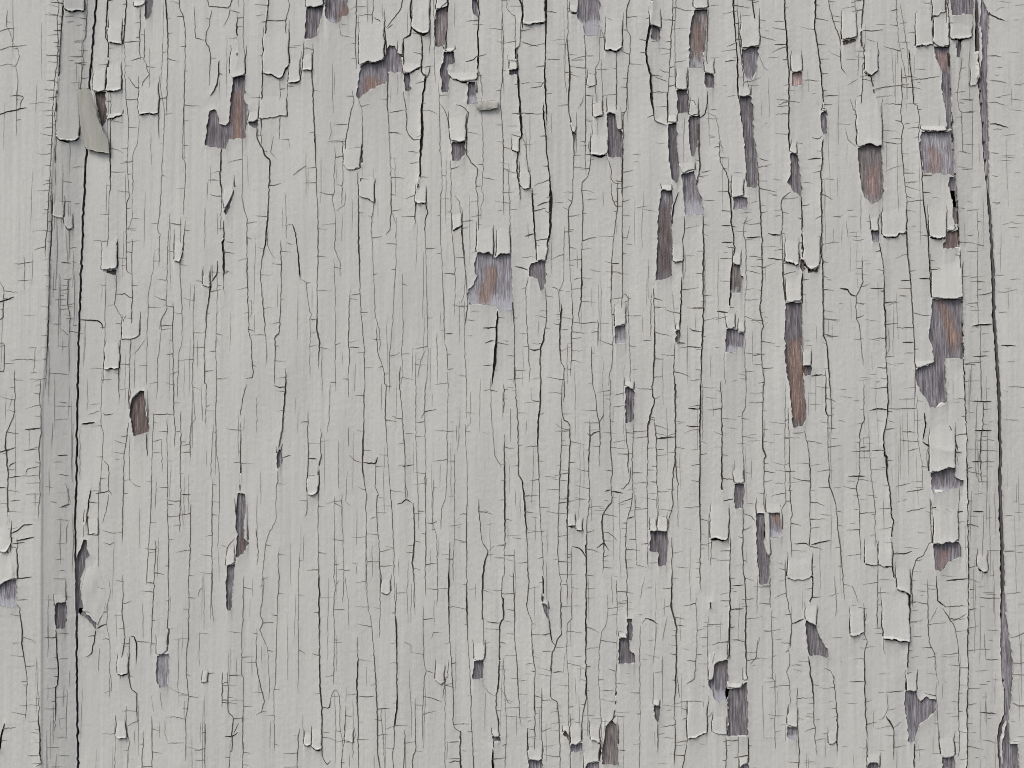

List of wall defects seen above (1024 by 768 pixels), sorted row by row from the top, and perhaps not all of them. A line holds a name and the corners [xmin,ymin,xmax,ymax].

crack [0,0,248,768]
peeling [205,27,313,148]
peeling [304,0,422,99]
peeling [467,222,513,311]
crack [221,0,1024,768]
peeling [655,0,715,280]
peeling [731,8,761,209]
peeling [784,226,821,428]
peeling [840,11,908,242]
peeling [914,0,989,408]
peeling [928,422,963,571]
peeling [686,641,748,739]